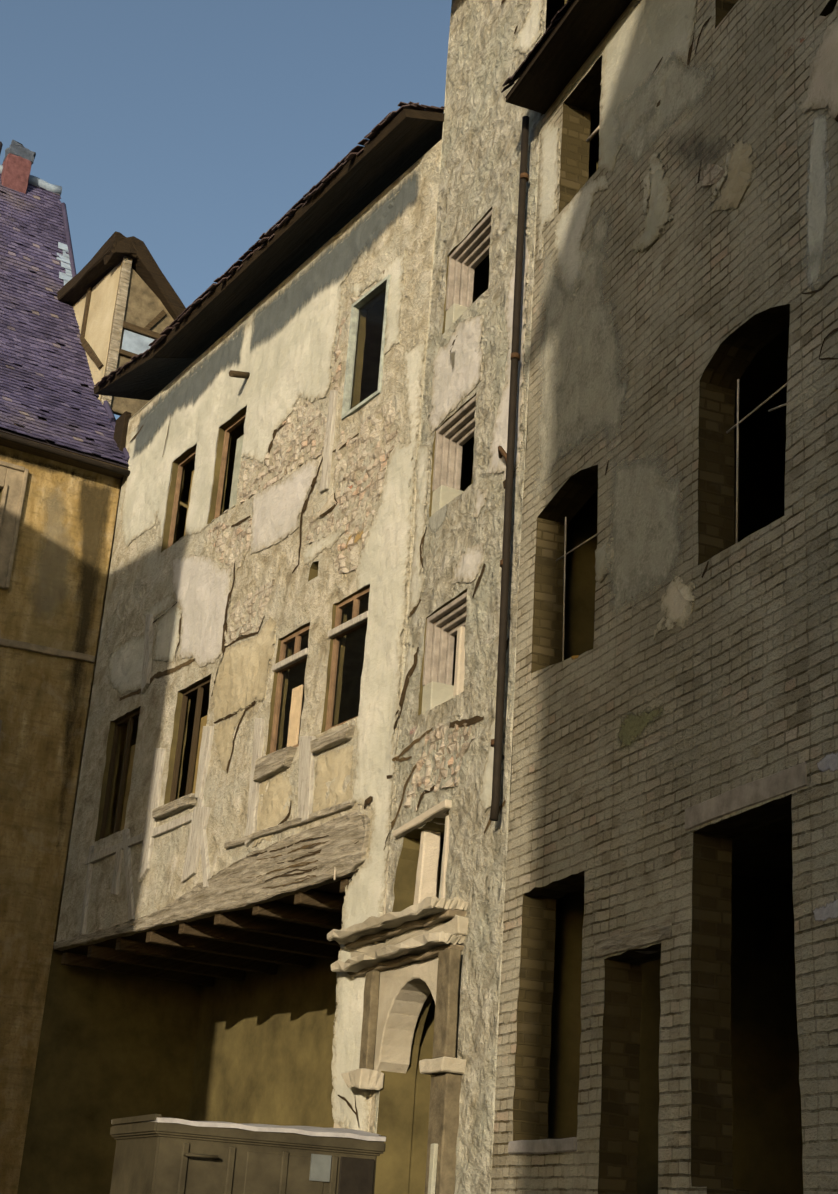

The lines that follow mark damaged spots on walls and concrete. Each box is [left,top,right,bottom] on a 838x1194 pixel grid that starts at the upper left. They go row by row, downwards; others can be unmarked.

peeling [488,0,697,480]
peeling [798,17,838,120]
peeling [108,250,508,930]
peeling [331,944,376,1133]